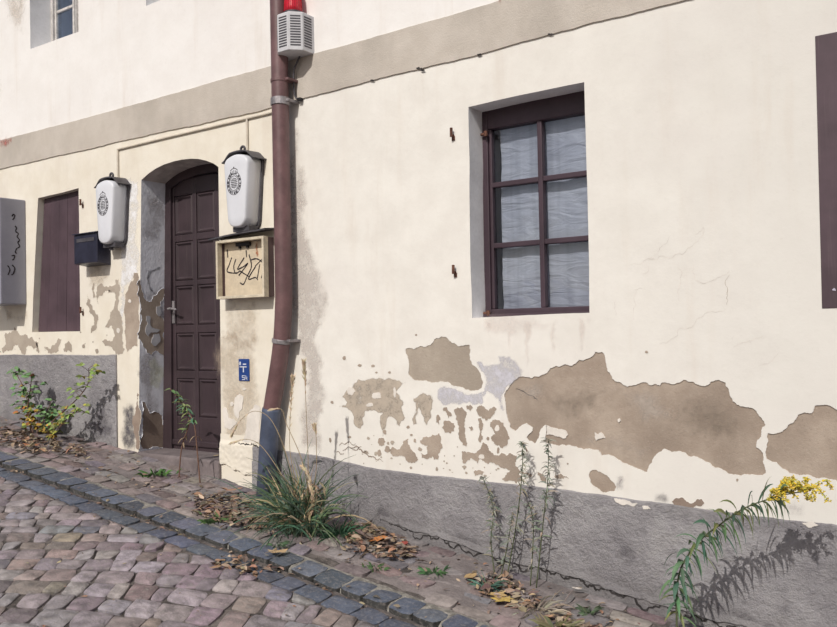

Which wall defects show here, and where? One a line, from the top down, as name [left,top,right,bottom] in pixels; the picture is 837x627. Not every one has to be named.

peeling [0,327,72,355]
peeling [82,267,164,356]
spalling [132,392,163,450]
peeling [343,364,569,484]